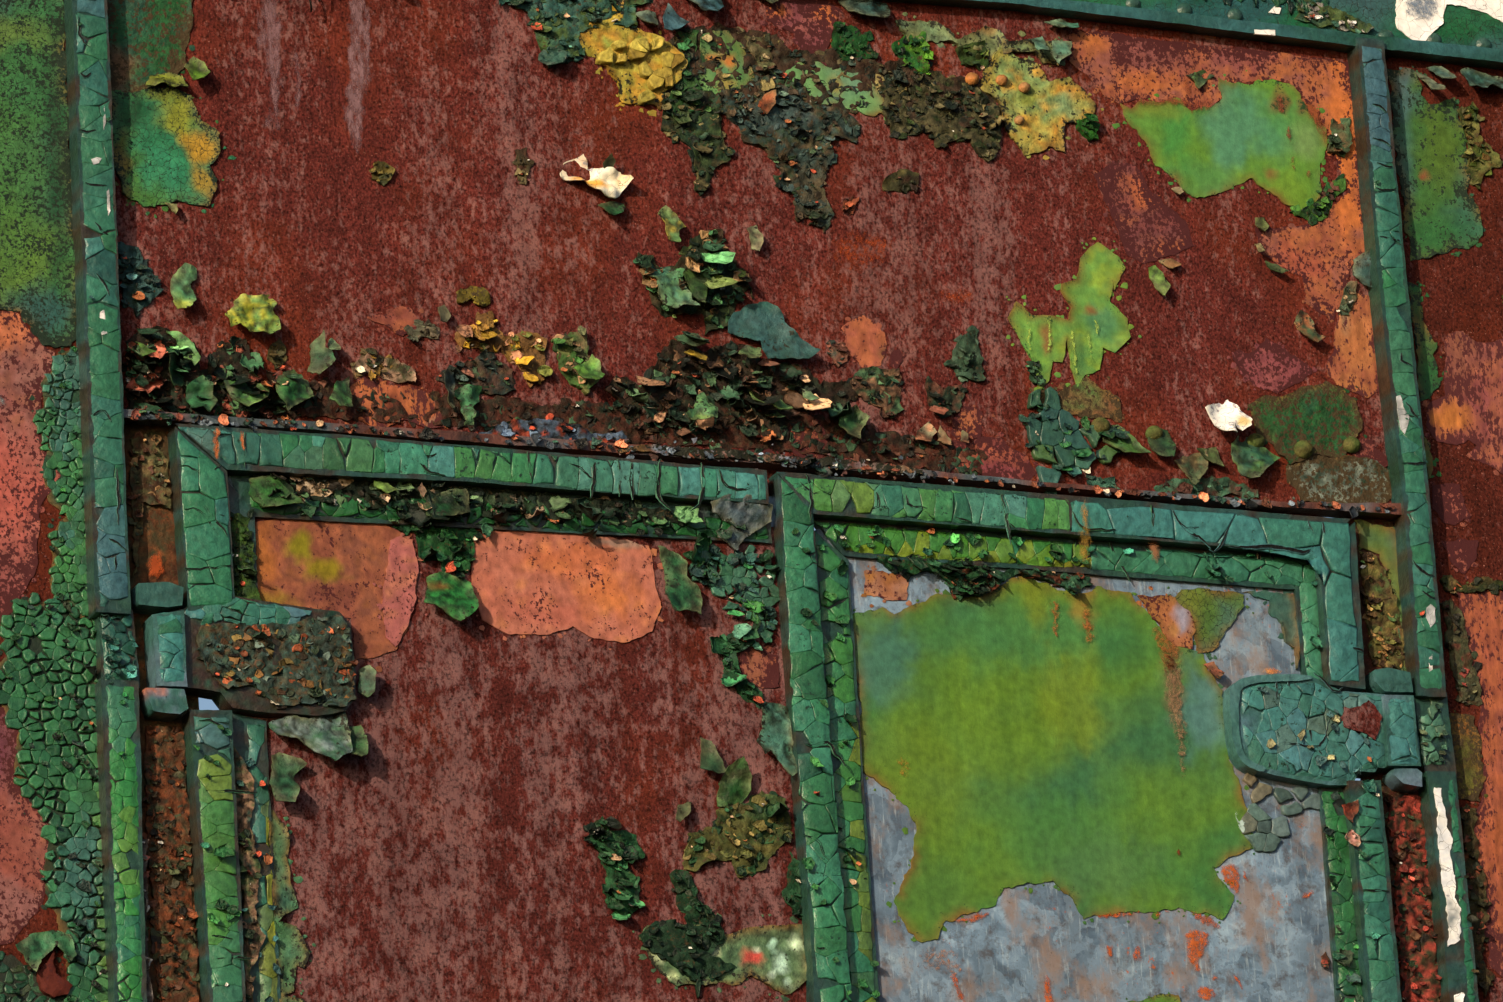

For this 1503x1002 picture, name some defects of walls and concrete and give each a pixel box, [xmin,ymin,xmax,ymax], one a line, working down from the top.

peeling [91,0,236,218]
crack [595,35,685,106]
peeling [498,0,1353,234]
peeling [1395,0,1503,41]
crack [0,0,143,1002]
peeling [117,205,1407,671]
crack [157,386,1449,1002]
peeling [852,553,1300,943]
crack [1362,46,1442,689]
peeling [1384,575,1503,1002]
crack [1448,780,1475,1002]
corrosion [1489,978,1503,1002]